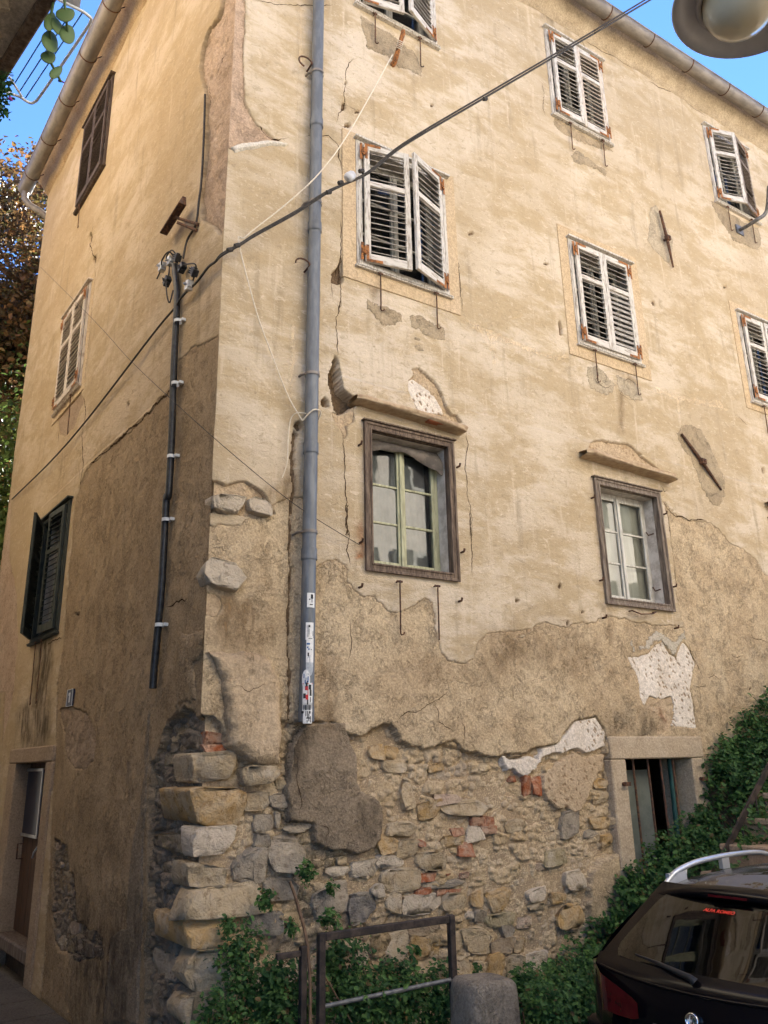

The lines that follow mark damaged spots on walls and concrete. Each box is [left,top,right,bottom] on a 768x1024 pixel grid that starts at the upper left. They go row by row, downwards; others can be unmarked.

flaking render [203,0,274,233]
crack [260,59,353,168]
crack [58,390,170,488]
crack [343,441,351,565]
crack [465,438,473,564]
flaking render [40,335,768,1024]